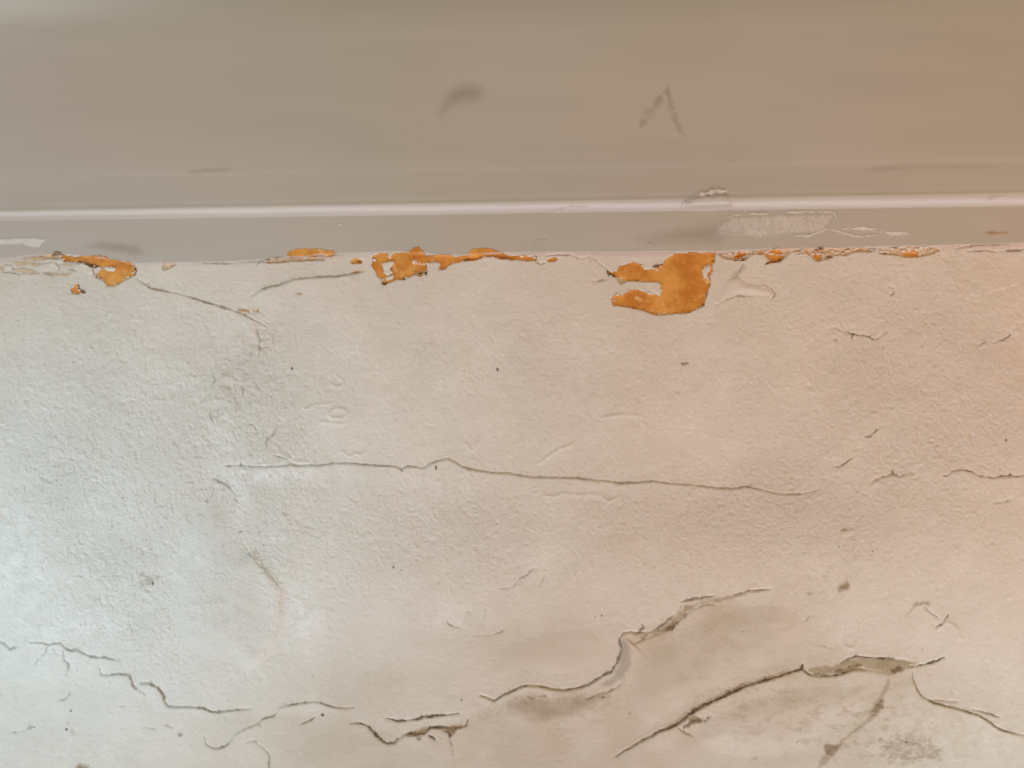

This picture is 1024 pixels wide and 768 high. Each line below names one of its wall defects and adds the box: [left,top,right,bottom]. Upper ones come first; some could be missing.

peeling [0,252,137,295]
peeling [266,248,335,264]
peeling [351,247,558,285]
peeling [607,246,939,316]
crack [567,596,709,699]
crack [616,655,886,756]
crack [360,713,468,744]